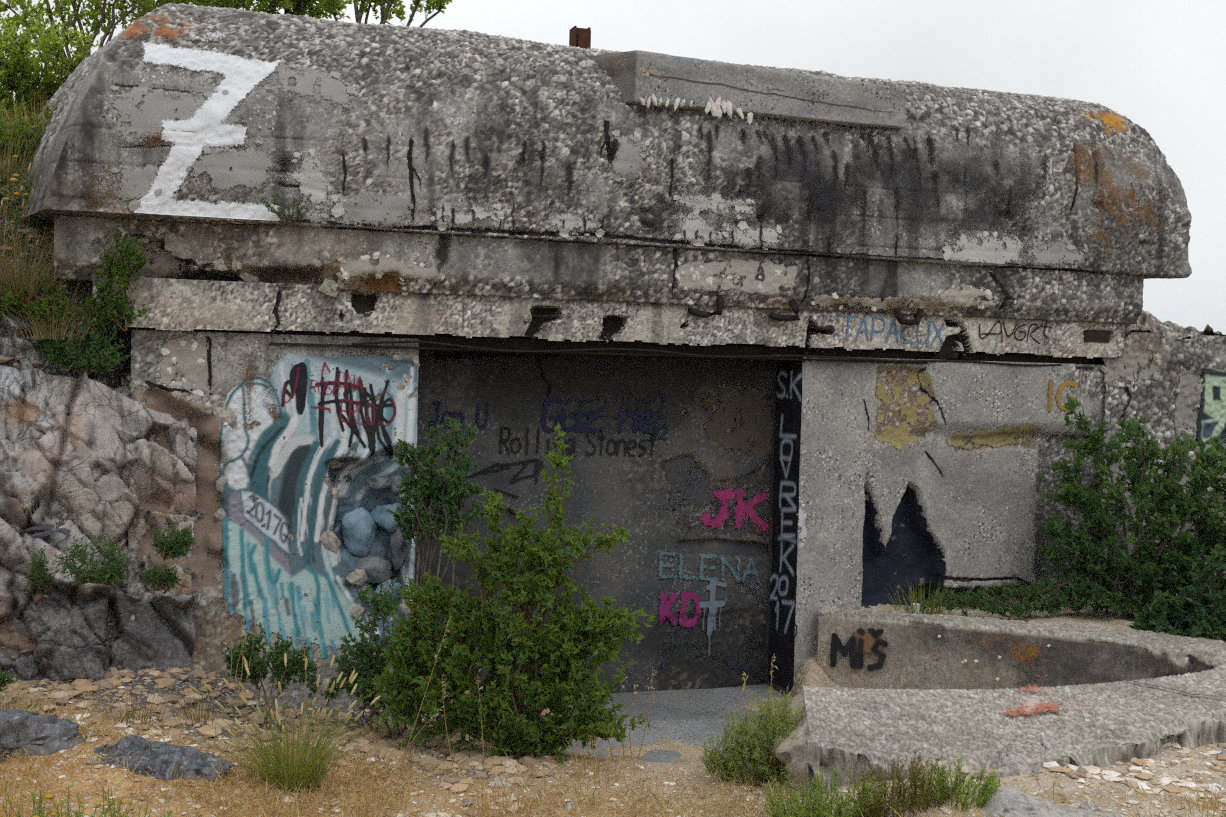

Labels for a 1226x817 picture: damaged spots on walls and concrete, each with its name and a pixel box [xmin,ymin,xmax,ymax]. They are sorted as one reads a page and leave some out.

damp [449,135,470,175]
damp [609,139,618,166]
damp [699,124,719,168]
damp [736,128,1028,250]
damp [430,205,455,272]
spalling [673,192,798,295]
peeling [942,231,1088,268]
spalling [109,233,446,323]
spalling [523,306,561,339]
spalling [599,315,625,342]
spalling [801,285,1017,359]